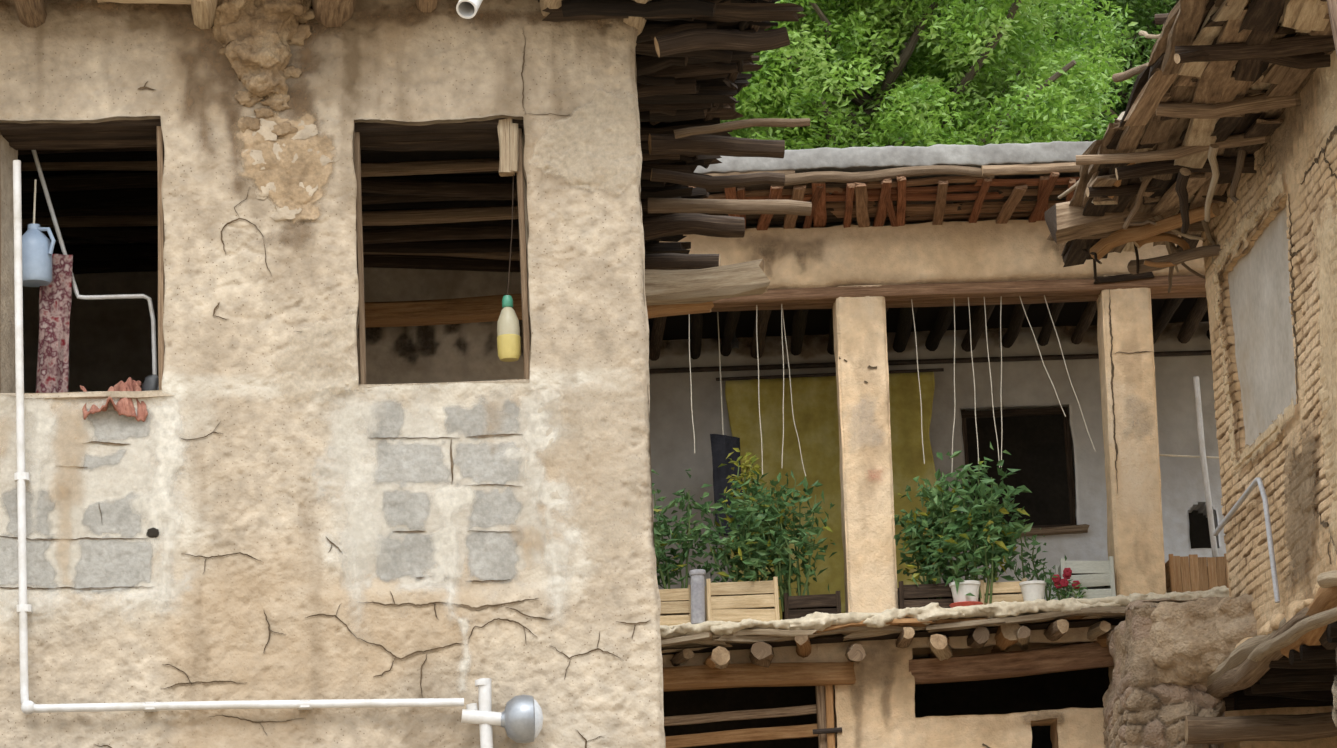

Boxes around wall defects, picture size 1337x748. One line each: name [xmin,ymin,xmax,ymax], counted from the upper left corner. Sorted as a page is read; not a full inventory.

peeling [288,8,315,46]
spalling [234,65,339,223]
crack [221,186,272,276]
crack [1288,125,1337,404]
crack [185,552,261,575]
crack [162,664,247,689]
crack [264,576,650,692]
crack [209,715,303,735]